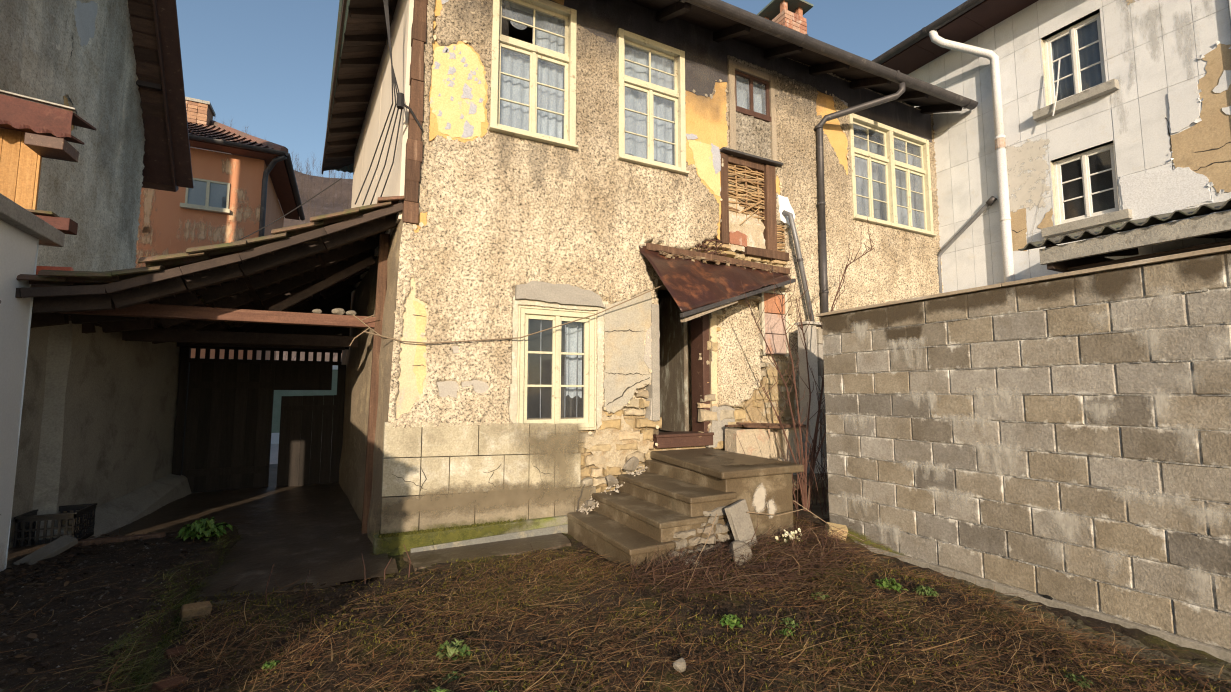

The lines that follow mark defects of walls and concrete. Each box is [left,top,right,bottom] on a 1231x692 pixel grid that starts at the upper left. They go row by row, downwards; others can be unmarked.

peeling [424,0,489,143]
peeling [685,79,787,267]
peeling [816,91,849,175]
peeling [1006,138,1053,251]
peeling [1168,41,1231,194]
peeling [394,278,429,418]
spalling [699,284,790,365]
spalling [697,346,796,449]
peeling [753,485,777,518]